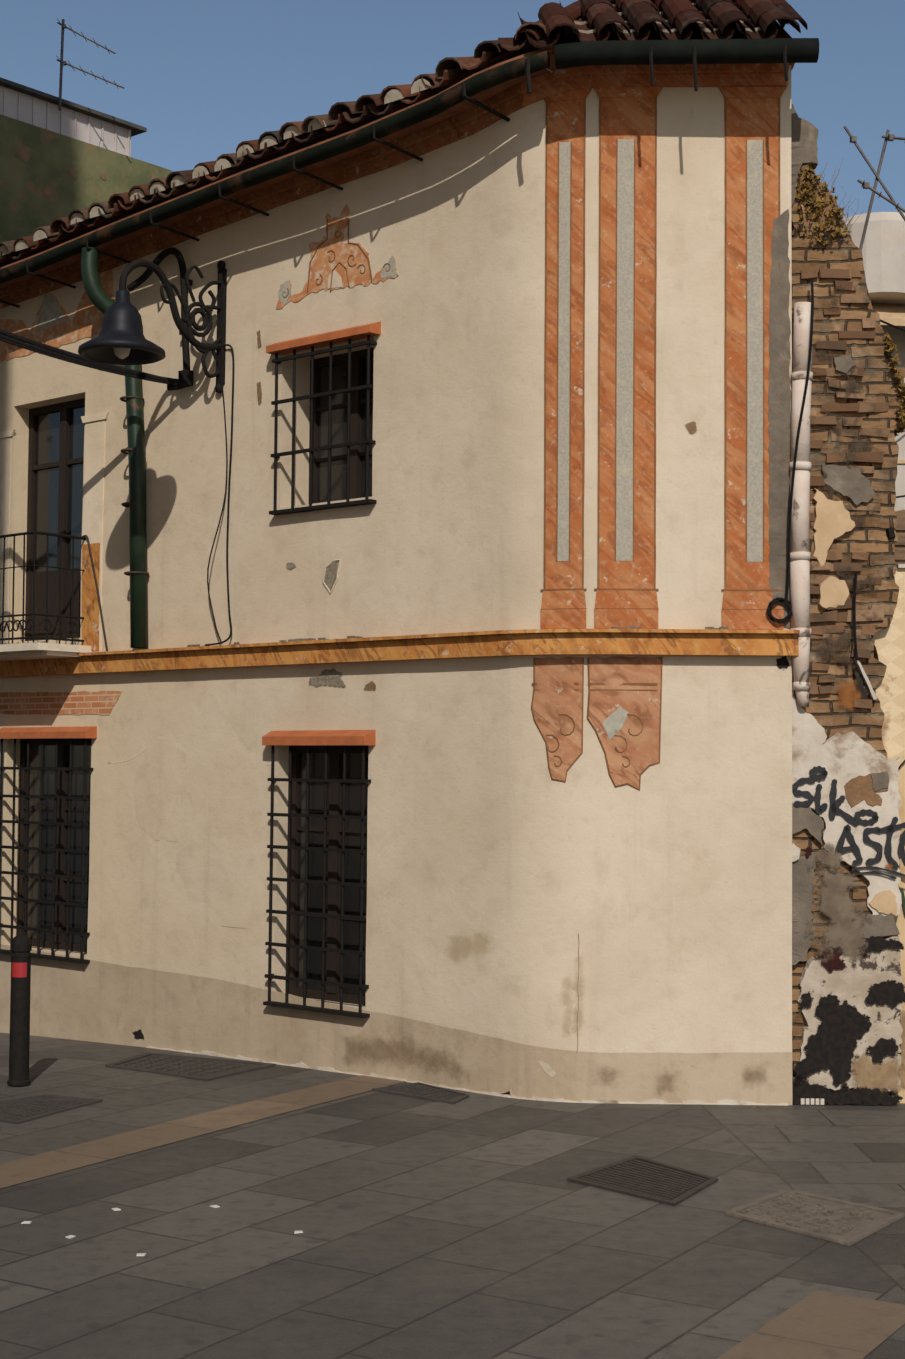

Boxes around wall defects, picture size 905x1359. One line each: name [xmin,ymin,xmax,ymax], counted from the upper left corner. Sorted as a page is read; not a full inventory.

peeling [833,355,856,374]
peeling [812,465,875,610]
spalling [322,559,341,594]
peeling [309,668,345,688]
spalling [776,656,790,669]
spalling [853,659,877,700]
peeling [792,685,905,1106]